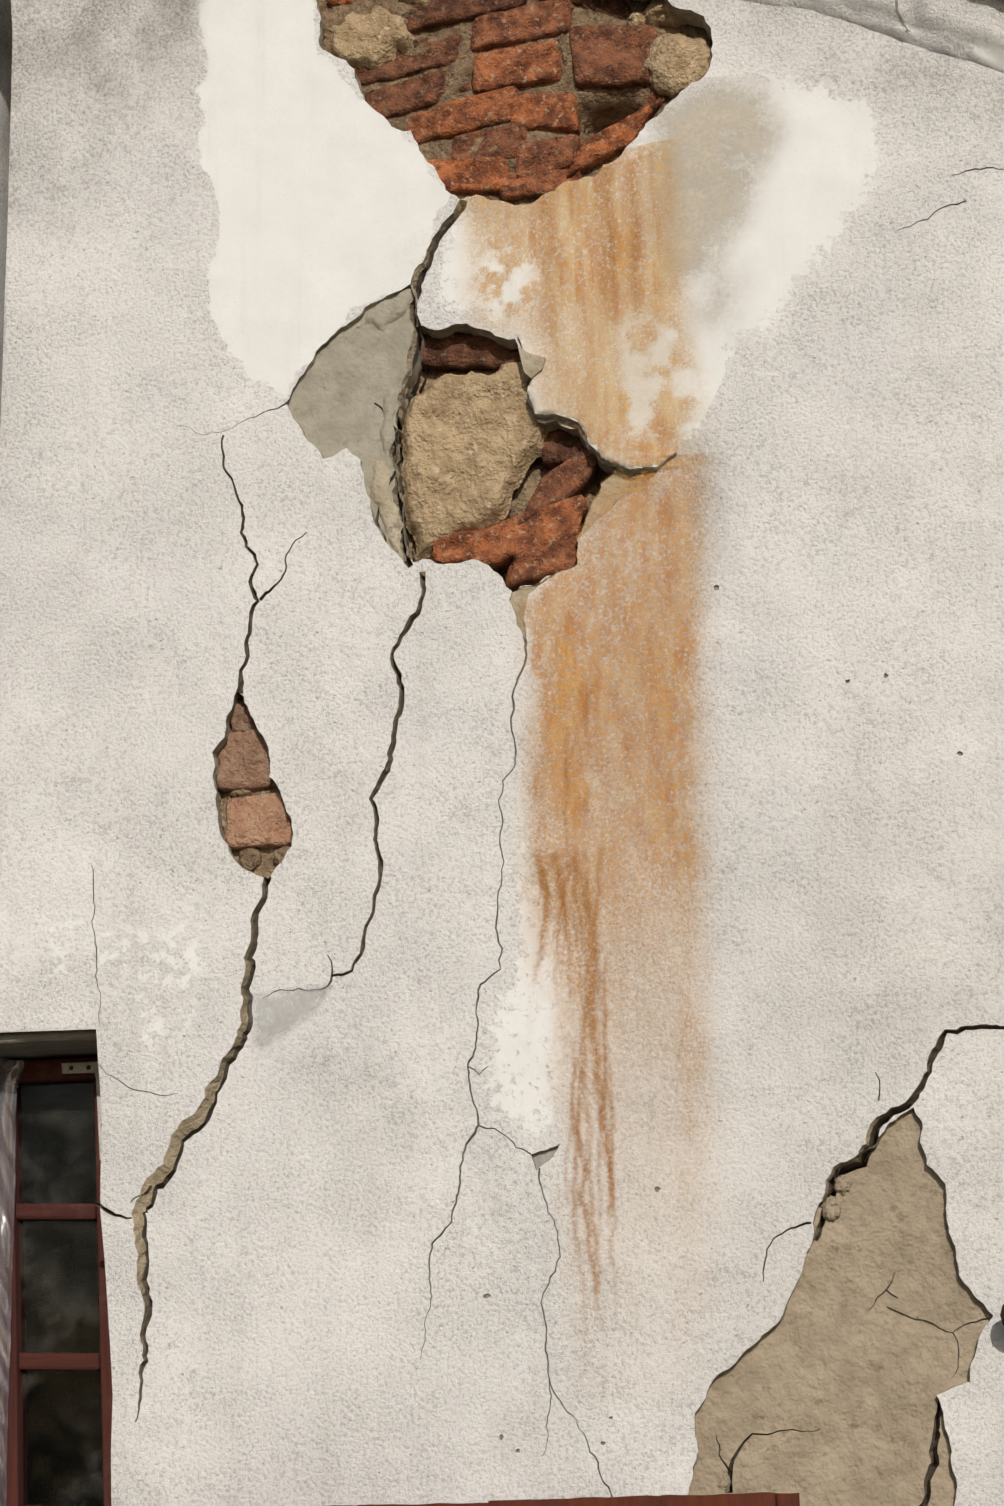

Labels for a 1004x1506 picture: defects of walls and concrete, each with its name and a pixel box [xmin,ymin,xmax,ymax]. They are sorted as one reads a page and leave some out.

flaking render [316,0,713,207]
flaking render [287,281,657,644]
crack [91,865,101,1027]
flaking render [212,691,293,881]
crack [95,199,466,1422]
crack [420,637,613,1497]
rust [472,145,697,1196]
flaking render [688,1108,993,1506]
crack [762,1024,1004,1281]